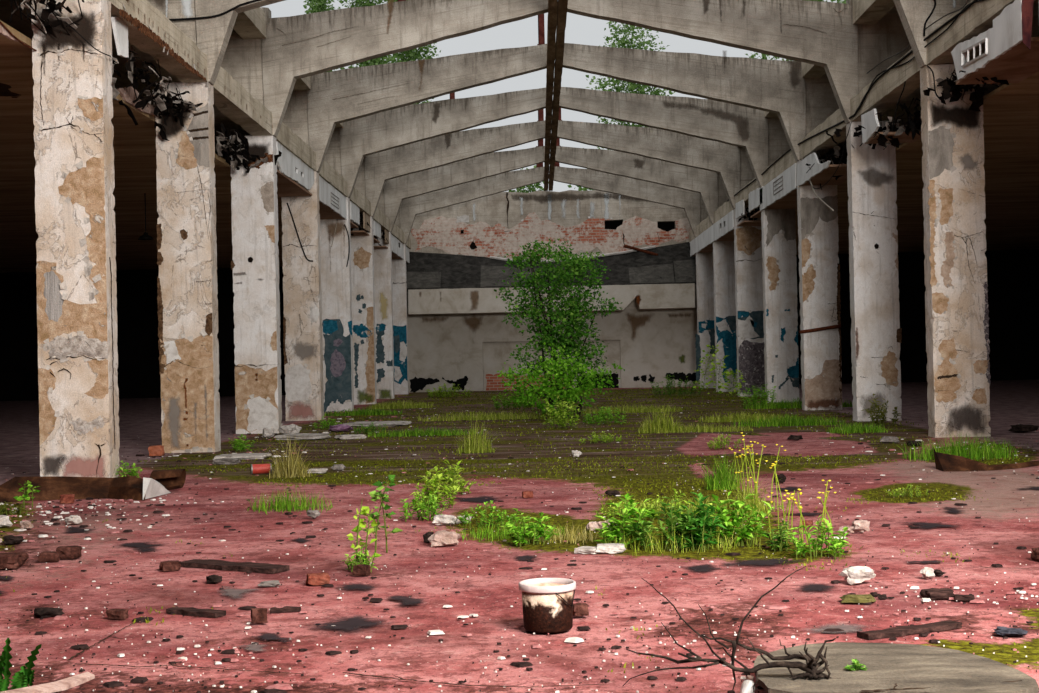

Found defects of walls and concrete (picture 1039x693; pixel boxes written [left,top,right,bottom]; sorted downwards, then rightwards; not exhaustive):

crack [38,46,102,142]
spalling [174,103,209,170]
leakage [788,59,801,87]
corrosion [1021,0,1034,50]
spalling [36,156,109,401]
flaking render [411,212,692,260]
spalling [736,194,838,302]
spalling [928,123,958,314]
spalling [38,365,105,445]
spalling [156,224,215,453]
peeling [235,294,470,433]
peeling [633,263,842,410]